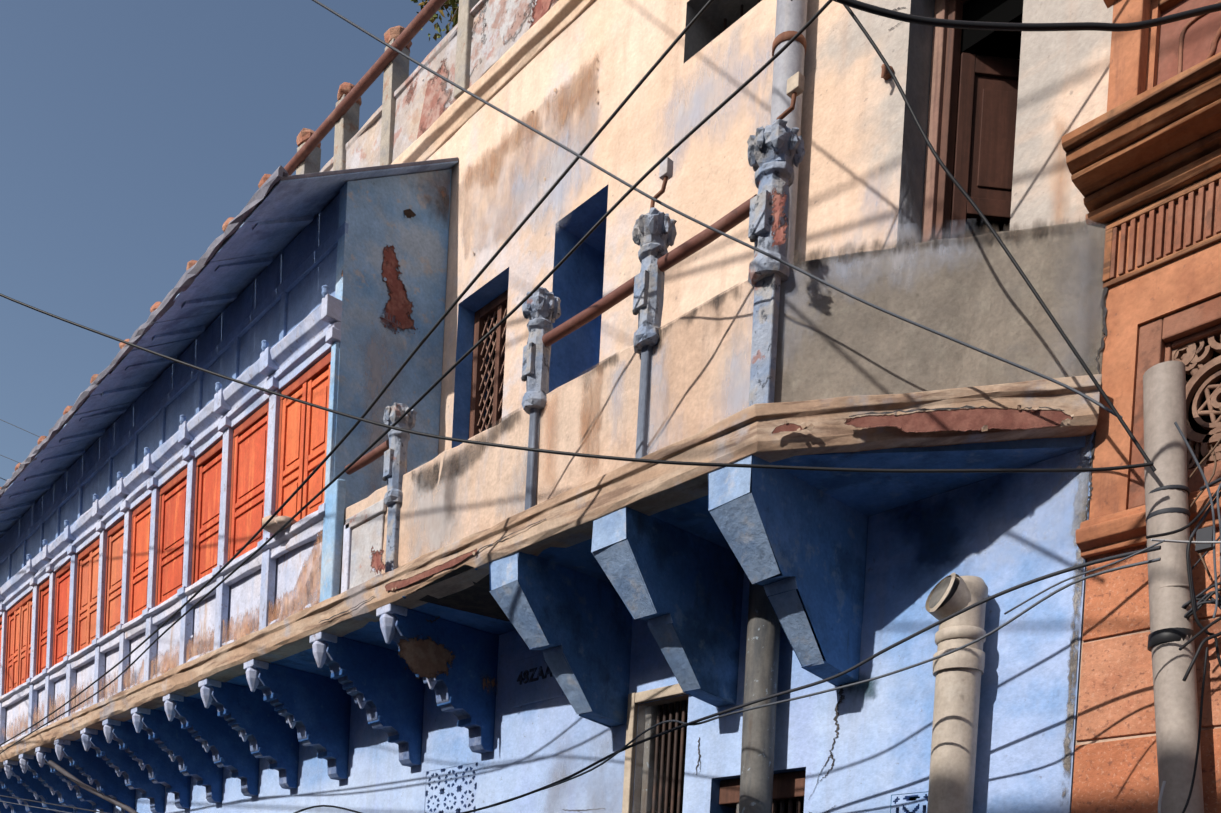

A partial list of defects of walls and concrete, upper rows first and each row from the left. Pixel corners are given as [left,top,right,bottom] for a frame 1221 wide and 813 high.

peeling [470,0,555,76]
peeling [406,58,454,140]
peeling [769,188,788,247]
leakage [793,241,909,275]
leakage [958,221,1086,243]
peeling [380,245,418,335]
peeling [845,405,1074,433]
spalling [397,634,455,679]
crack [808,685,845,813]